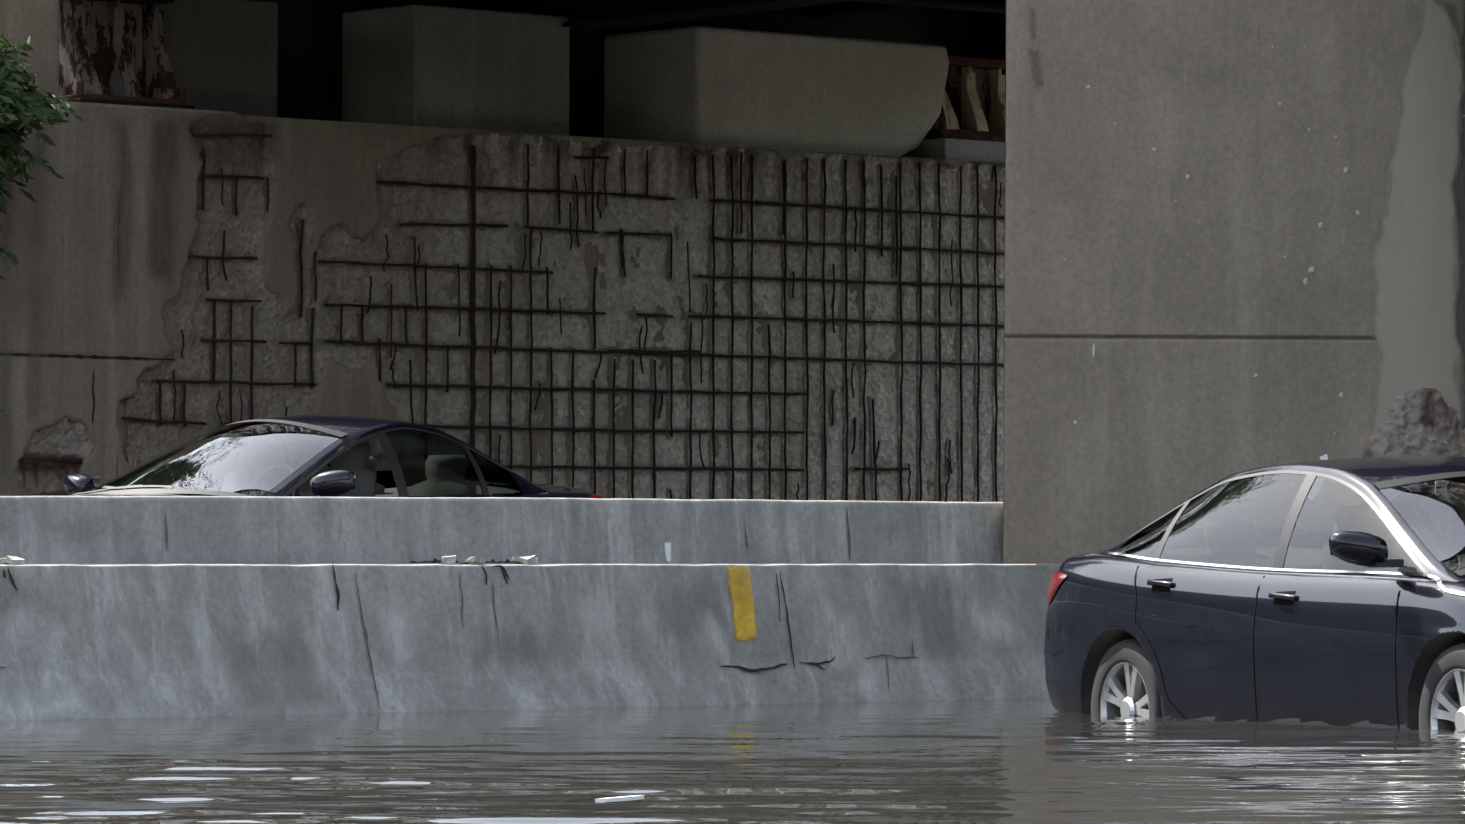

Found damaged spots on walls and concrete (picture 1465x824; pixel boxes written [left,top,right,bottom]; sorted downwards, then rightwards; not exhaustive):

spalling [15,418,94,496]
spalling [121,122,1005,502]
damp [1371,0,1465,431]